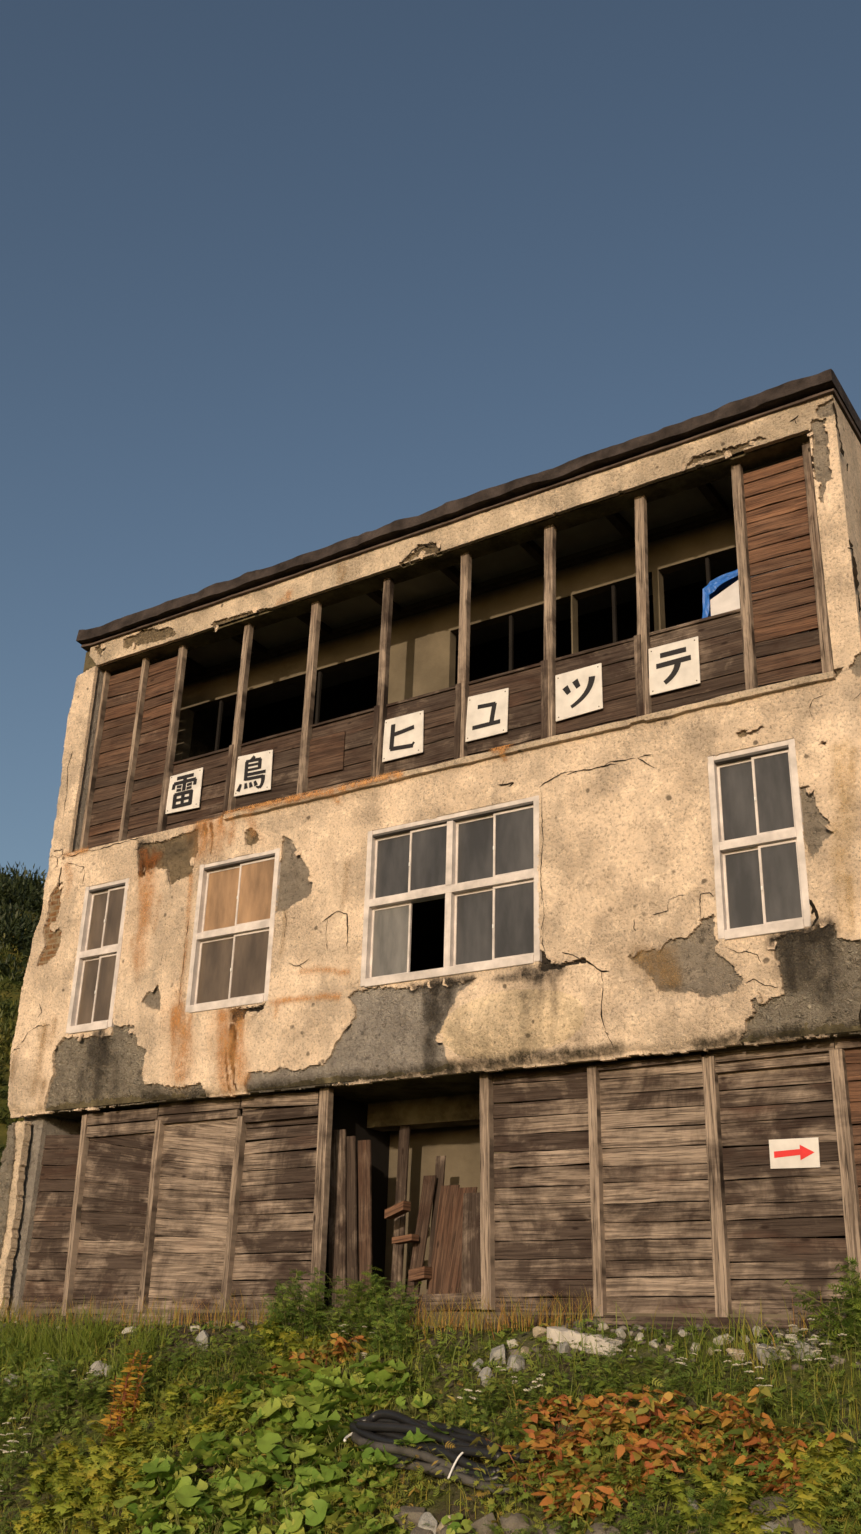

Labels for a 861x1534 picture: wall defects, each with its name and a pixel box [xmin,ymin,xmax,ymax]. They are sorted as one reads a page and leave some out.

peeling [807,400,835,503]
peeling [38,883,64,966]
peeling [135,829,199,885]
peeling [277,837,314,911]
crack [499,754,654,1045]
peeling [800,786,836,856]
spalling [629,915,861,1043]
spalling [46,1025,207,1112]
spalling [246,977,473,1093]